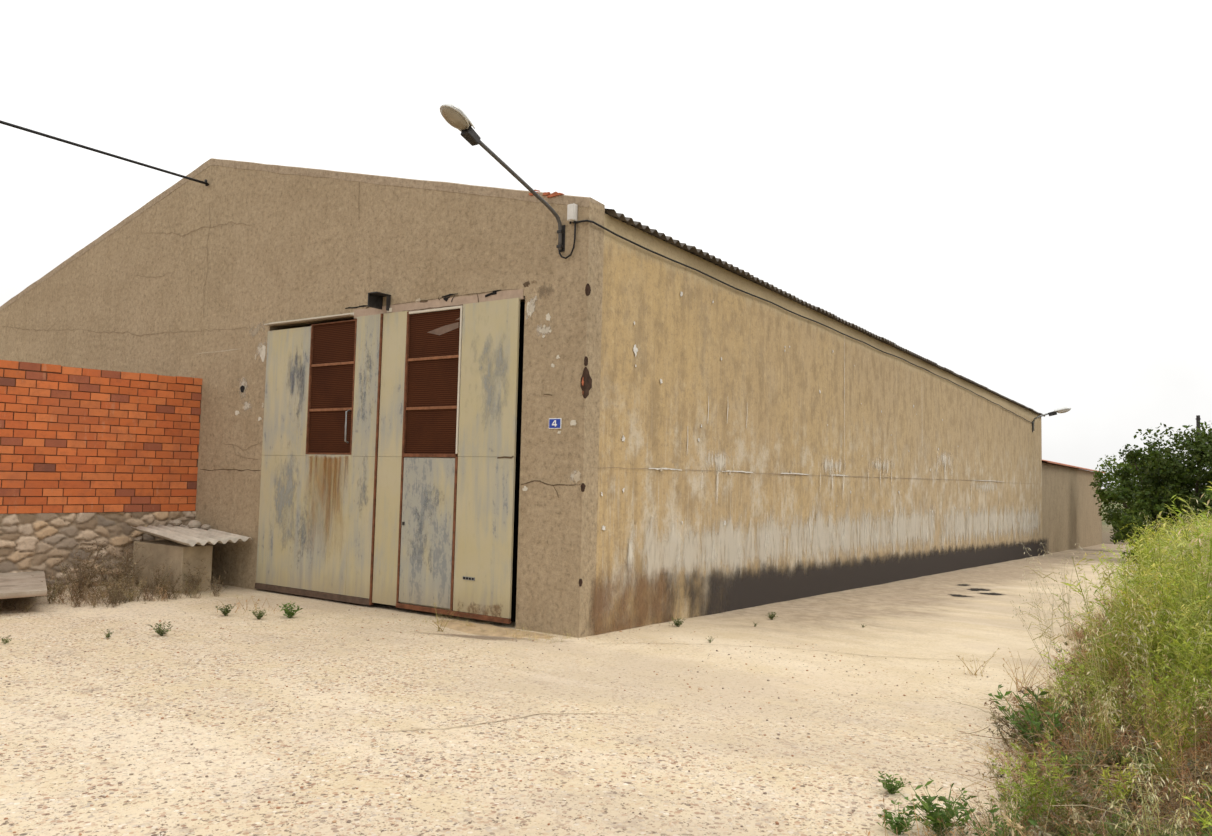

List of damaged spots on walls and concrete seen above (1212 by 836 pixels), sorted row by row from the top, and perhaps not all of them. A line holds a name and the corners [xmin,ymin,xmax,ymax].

crack [2,204,253,342]
leakage [628,483,1049,616]